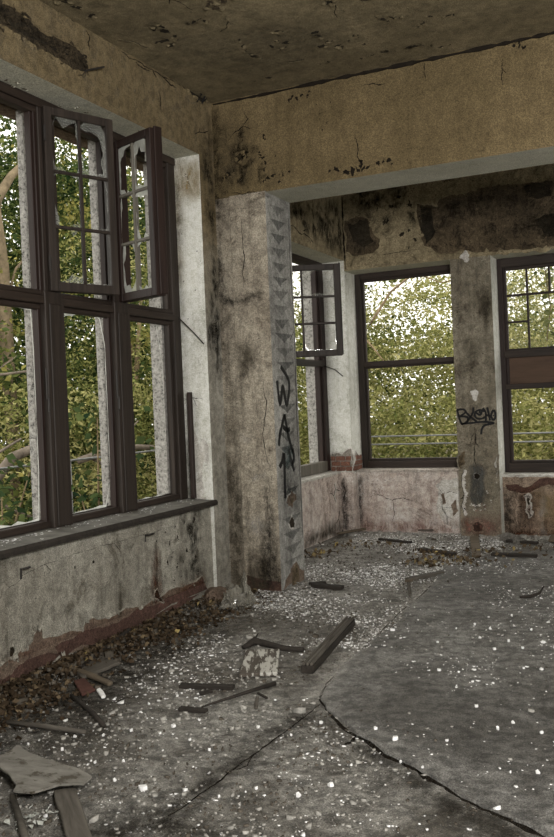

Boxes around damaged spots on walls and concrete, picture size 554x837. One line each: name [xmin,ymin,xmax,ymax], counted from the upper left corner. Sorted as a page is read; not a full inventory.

spalling [0,0,89,75]
crack [213,31,554,136]
leakage [210,259,222,371]
leakage [228,473,281,590]
spalling [330,447,363,474]
peeling [434,449,554,534]
peeling [0,515,208,684]
crack [362,580,436,650]
crack [168,677,543,837]